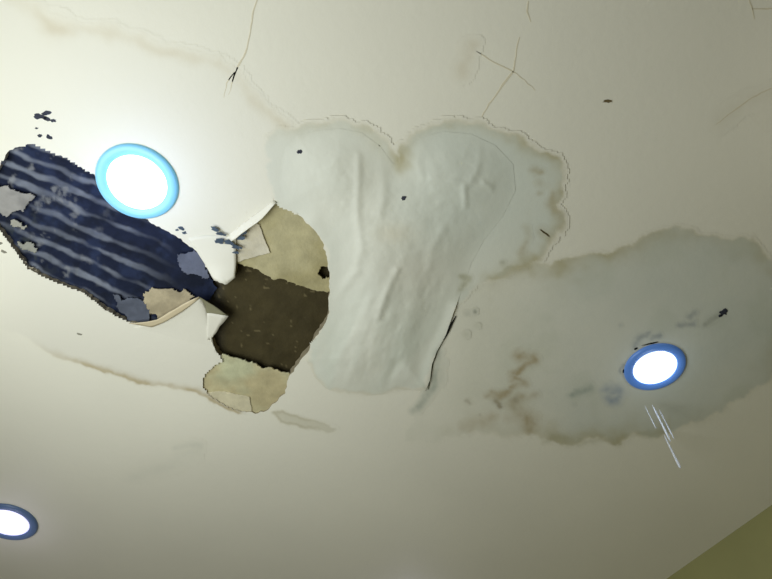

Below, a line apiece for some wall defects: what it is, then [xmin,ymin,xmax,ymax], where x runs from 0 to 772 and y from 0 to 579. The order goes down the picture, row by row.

crack [224,0,257,96]
crack [477,1,535,116]
damp [0,0,570,310]
damp [0,230,246,415]
peeling [0,111,330,413]
damp [270,409,340,435]
damp [402,223,772,468]